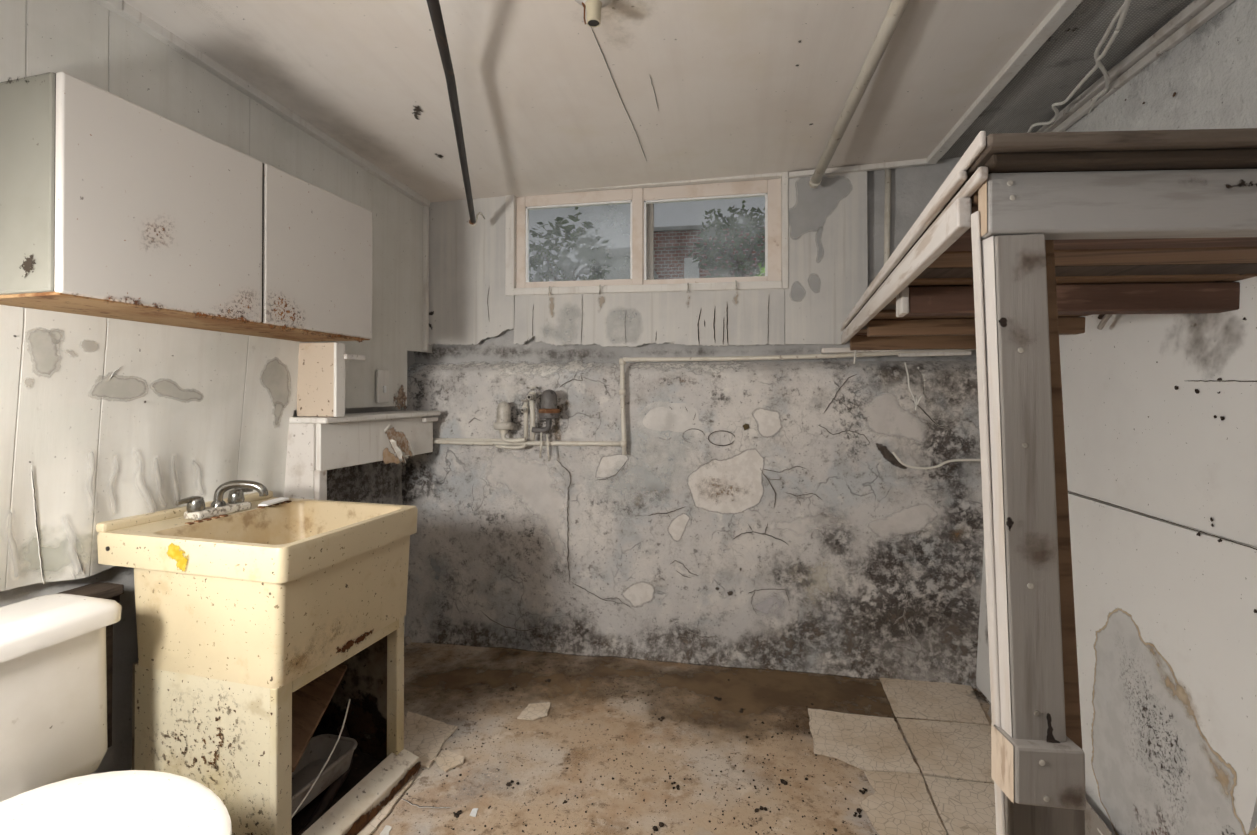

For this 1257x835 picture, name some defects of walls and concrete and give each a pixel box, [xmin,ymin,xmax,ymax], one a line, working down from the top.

peeling [383,424,414,464]
damp [411,348,616,411]
crack [669,406,735,446]
spalling [753,409,781,437]
crack [819,374,870,443]
damp [875,366,978,402]
damp [26,538,82,570]
damp [327,452,438,504]
crack [557,460,630,607]
damp [404,420,990,736]
spalling [668,449,764,541]
crack [735,466,822,546]